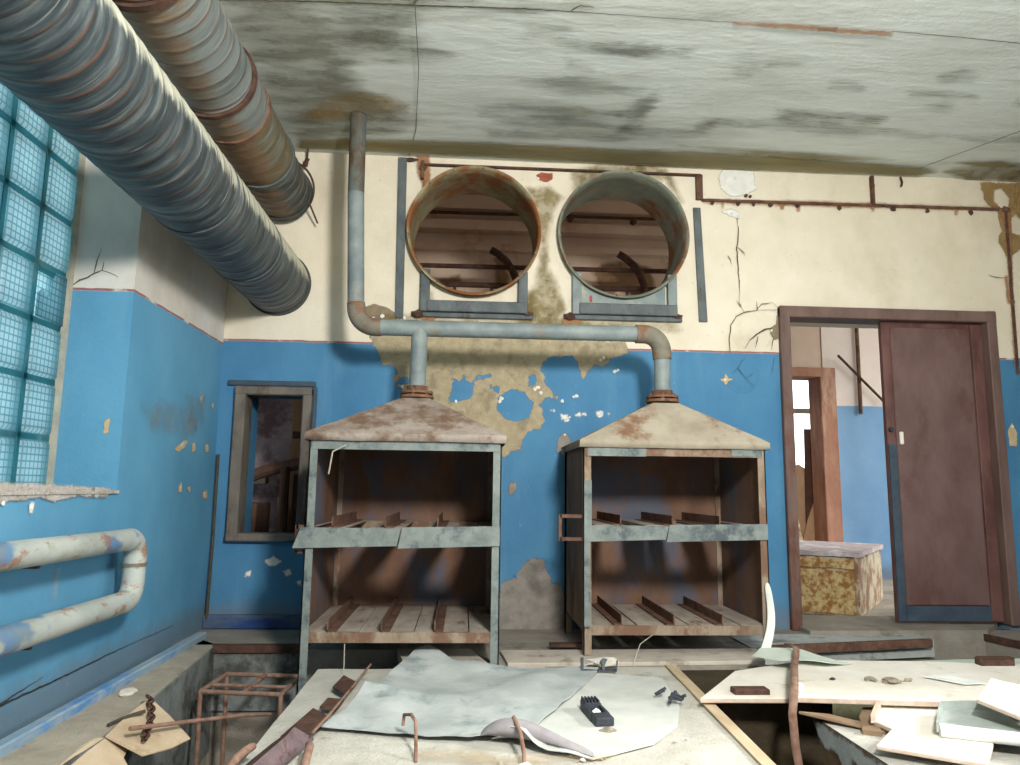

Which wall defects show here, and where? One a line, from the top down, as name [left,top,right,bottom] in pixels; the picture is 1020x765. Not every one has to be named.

corrosion [734,22,891,36]
damp [239,0,932,187]
peeling [369,336,411,390]
peeling [426,337,629,457]
damp [528,189,564,324]
crack [728,226,774,385]
damp [947,162,1020,280]
spalling [0,482,110,513]
peeling [499,558,564,629]